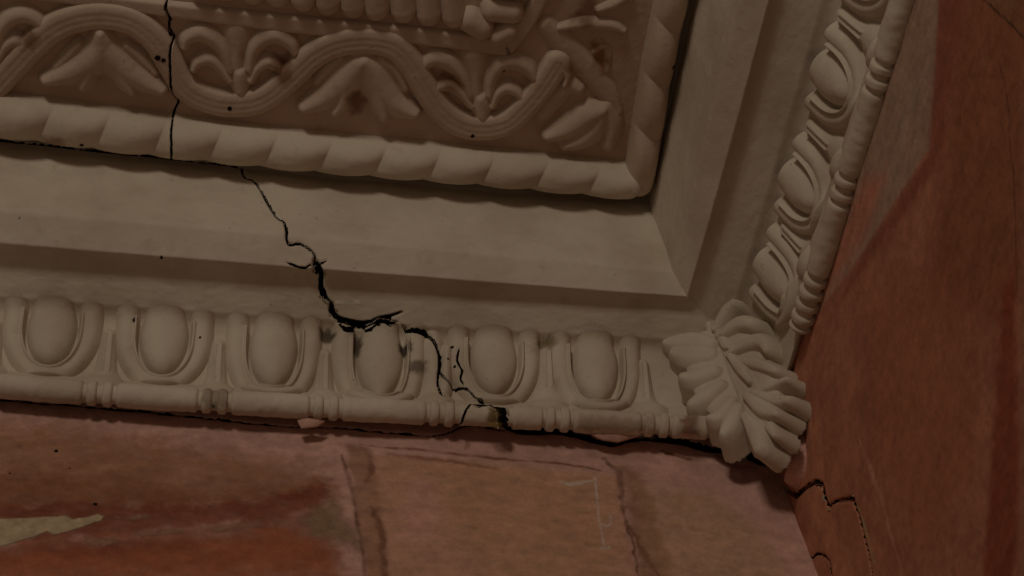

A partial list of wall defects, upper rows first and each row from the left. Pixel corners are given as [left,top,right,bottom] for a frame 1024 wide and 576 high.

crack [0,0,766,466]
peeling [0,514,104,546]
crack [785,479,873,573]